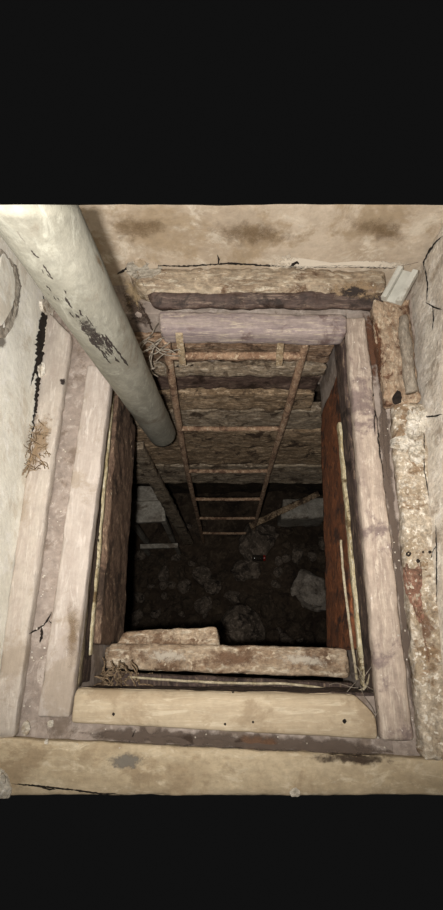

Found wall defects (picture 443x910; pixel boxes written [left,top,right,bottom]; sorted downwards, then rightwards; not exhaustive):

crack [158,237,442,329]
crack [31,296,55,437]
crack [29,612,52,642]
water stain [112,754,138,768]
water stain [93,723,393,765]
crack [11,783,122,795]